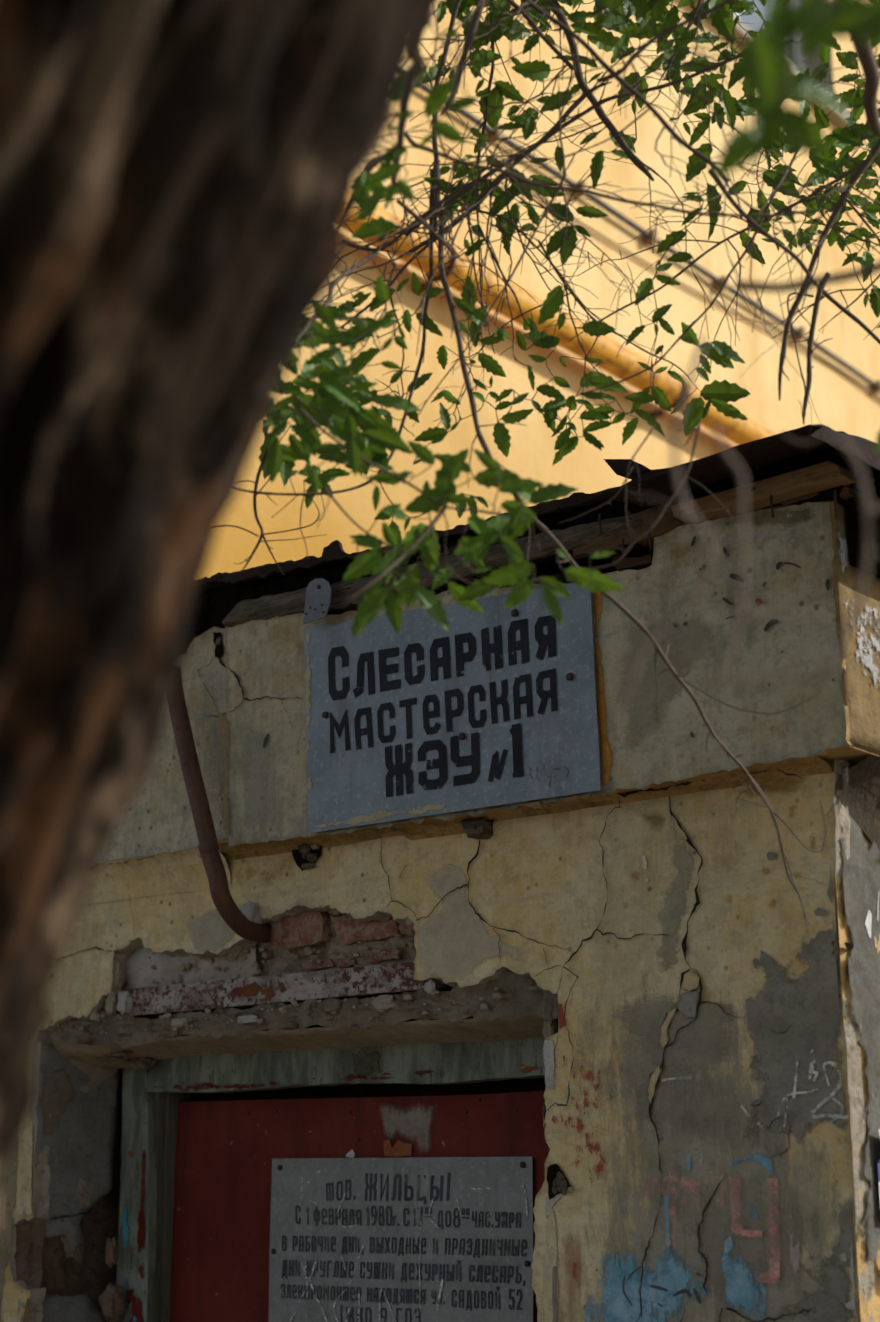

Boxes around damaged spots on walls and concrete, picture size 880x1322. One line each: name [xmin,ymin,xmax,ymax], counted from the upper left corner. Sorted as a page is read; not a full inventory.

crack [194,658,299,728]
peeling [865,892,879,947]
spalling [62,901,416,1070]
corrosion [230,981,286,1002]
spalling [317,979,456,1019]
spalling [528,987,565,1090]
crack [380,780,811,1322]
spalling [14,1149,145,1322]